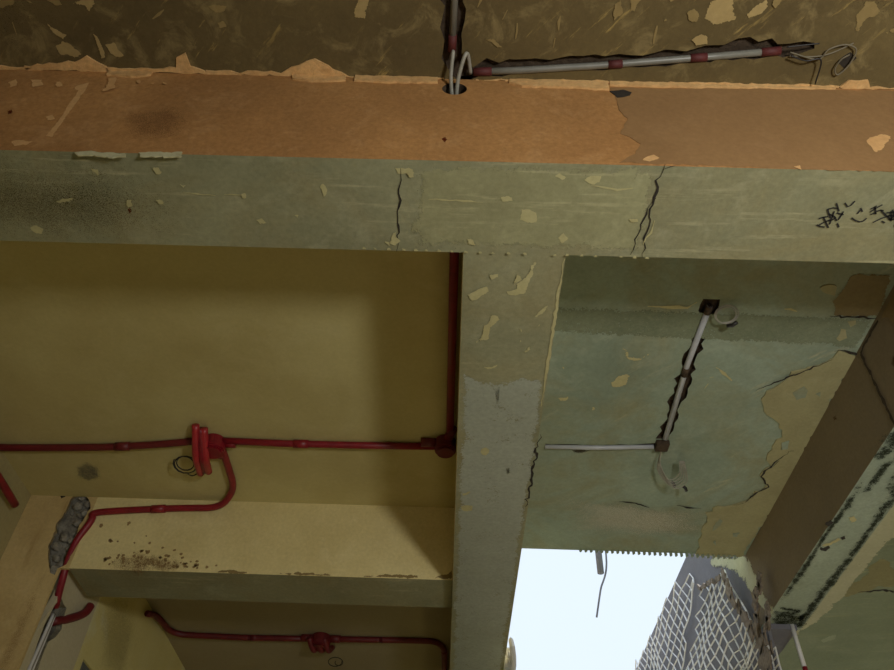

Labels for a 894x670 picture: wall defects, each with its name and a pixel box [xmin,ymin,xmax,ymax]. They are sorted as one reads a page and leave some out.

peeling [354,0,369,18]
peeling [687,0,736,25]
peeling [747,0,781,18]
peeling [855,0,886,31]
peeling [692,34,708,46]
peeling [610,90,632,98]
peeling [867,134,891,152]
crack [395,168,403,251]
crack [630,165,673,255]
peeling [579,273,891,560]
crack [525,434,542,507]
damp [771,430,894,628]